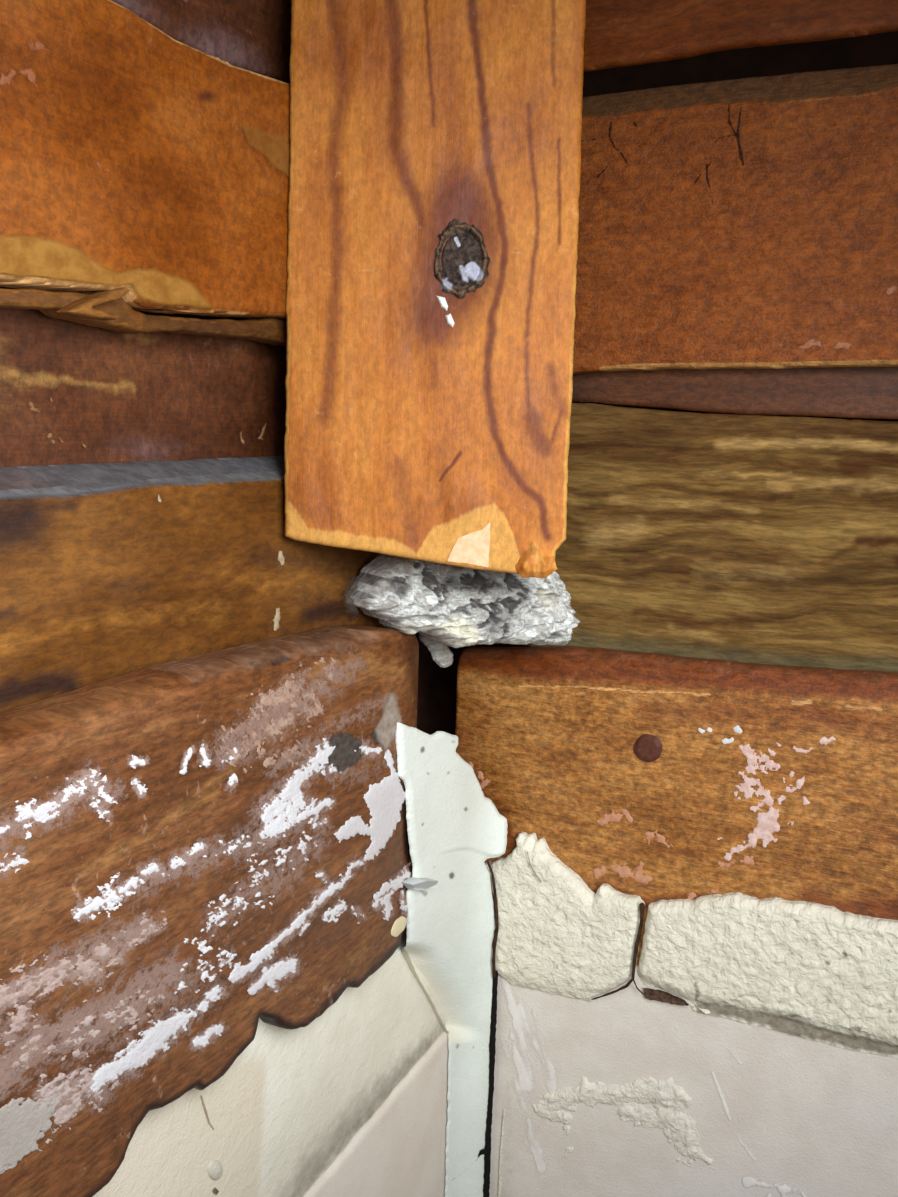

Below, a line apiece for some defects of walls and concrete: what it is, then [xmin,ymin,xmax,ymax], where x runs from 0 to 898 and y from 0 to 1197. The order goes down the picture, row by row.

peeling [698,725,836,868]
peeling [597,808,633,826]
peeling [645,829,674,849]
peeling [593,862,652,885]
peeling [0,657,438,1174]
crack [591,903,645,1000]
flaking render [643,988,711,1014]